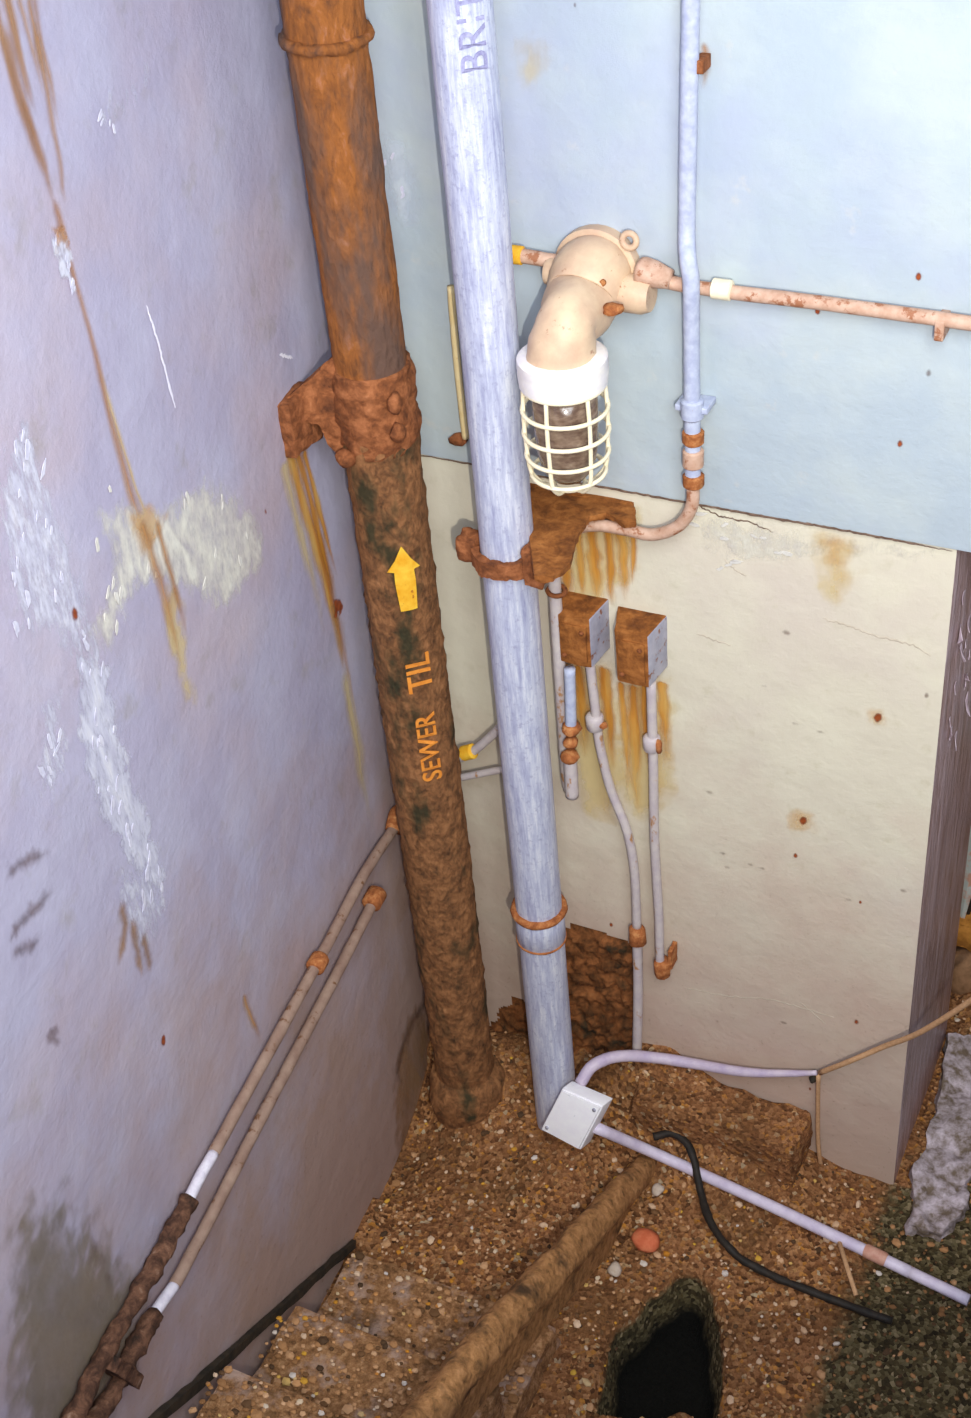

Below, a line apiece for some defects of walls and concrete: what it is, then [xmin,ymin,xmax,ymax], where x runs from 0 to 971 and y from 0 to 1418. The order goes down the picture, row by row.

rust [0,0,61,163]
rust [66,246,184,669]
rust [284,450,343,639]
rust [563,532,636,595]
rust [566,664,669,807]